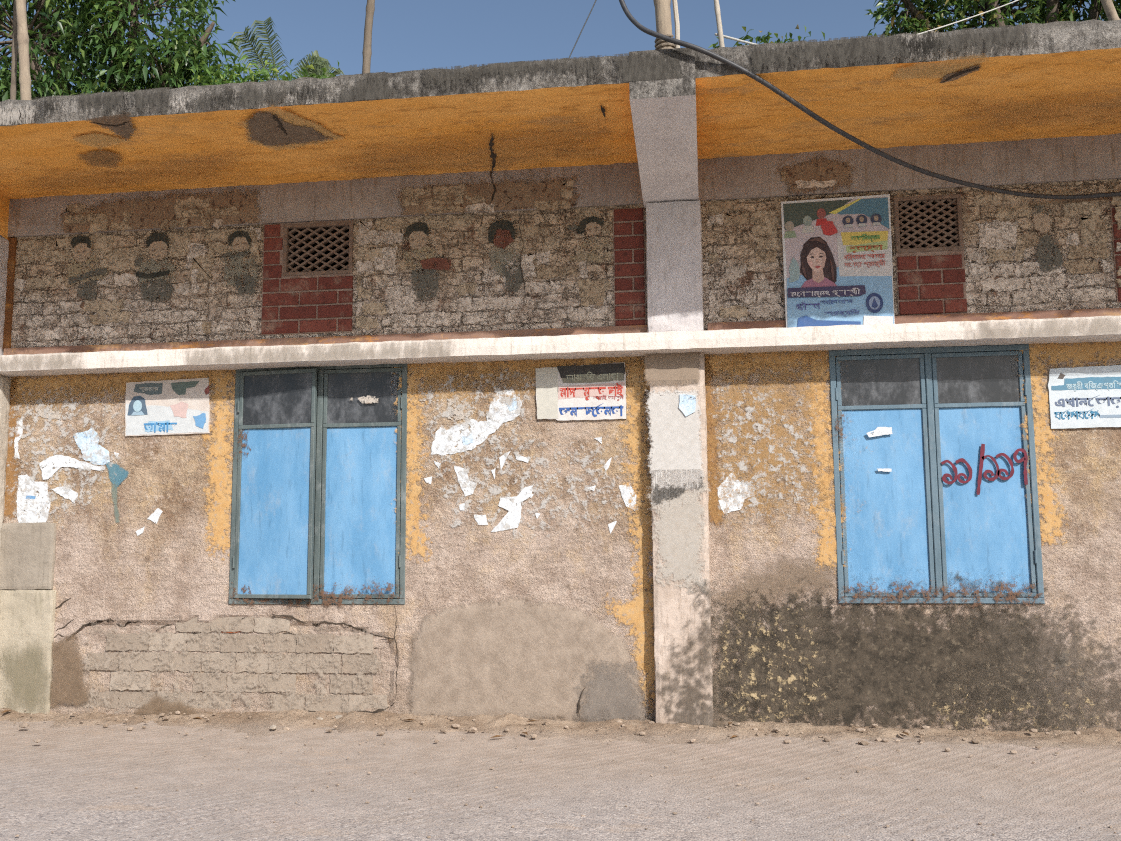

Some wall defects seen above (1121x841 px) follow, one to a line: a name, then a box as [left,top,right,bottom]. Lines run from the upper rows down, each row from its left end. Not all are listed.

crack [489,133,527,302]
flaking render [967,189,1121,306]
peeling [4,370,236,560]
flaking render [50,616,392,720]
corrosion [227,581,403,611]
peeling [392,350,846,713]
leakage [659,564,1121,732]
corrosion [835,574,1046,612]